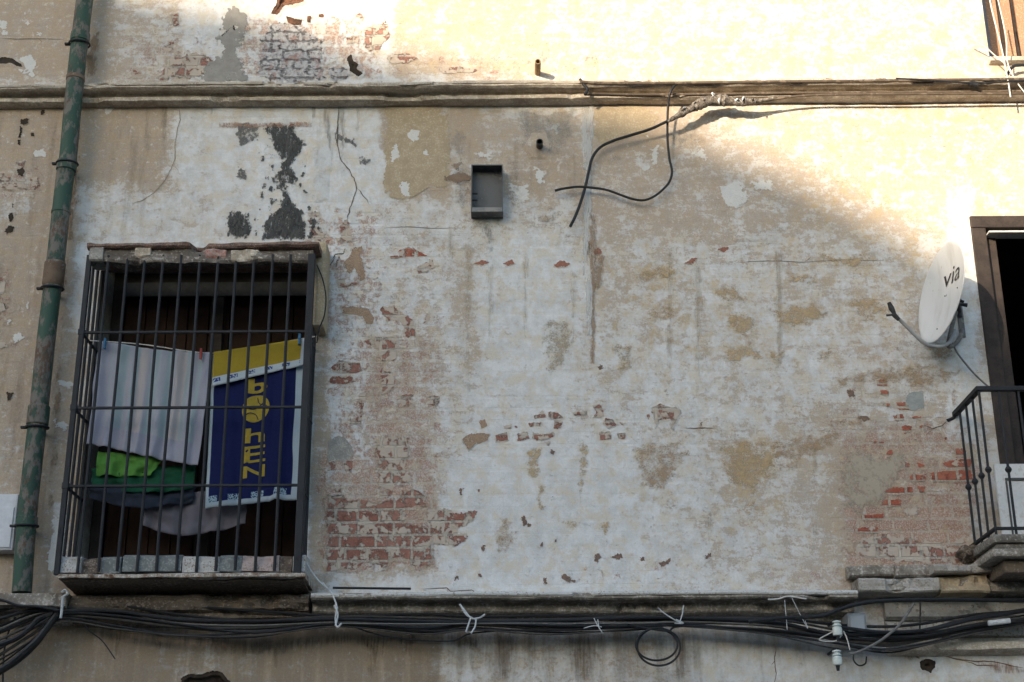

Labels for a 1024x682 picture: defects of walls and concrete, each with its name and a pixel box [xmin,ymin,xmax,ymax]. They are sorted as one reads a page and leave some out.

spalling [150,41,213,80]
spalling [254,0,417,84]
spalling [438,66,477,74]
crack [132,110,181,204]
crack [335,108,368,219]
spalling [390,246,438,273]
spalling [340,305,432,407]
spalling [321,359,477,575]
spalling [461,405,626,457]
spalling [647,402,682,430]
spalling [876,379,923,440]
spalling [851,437,973,566]